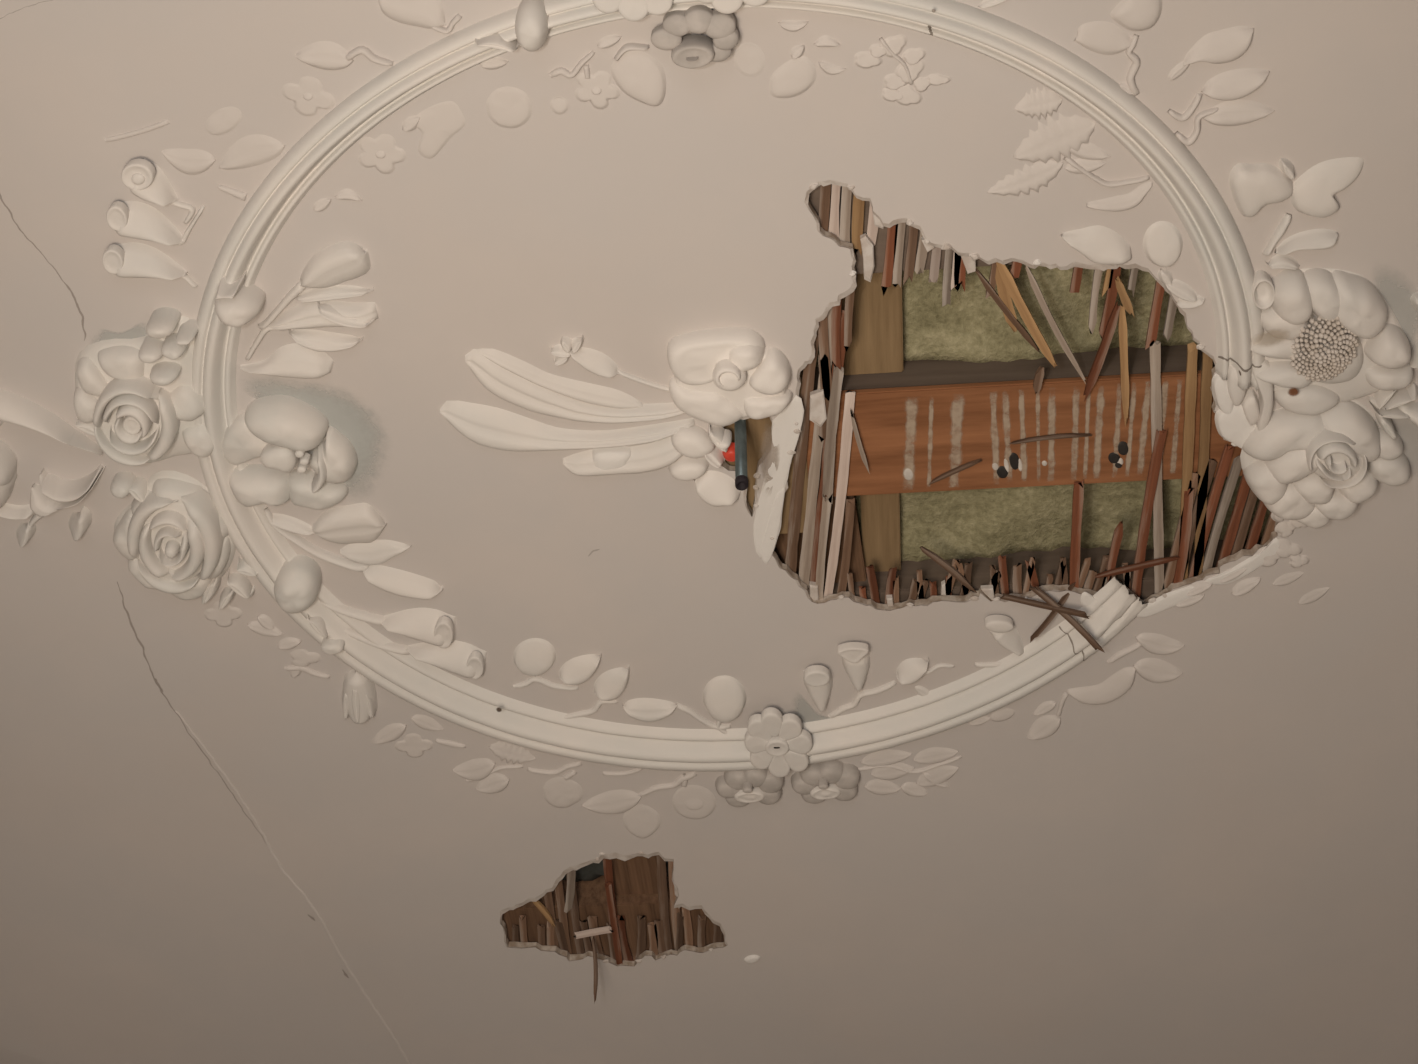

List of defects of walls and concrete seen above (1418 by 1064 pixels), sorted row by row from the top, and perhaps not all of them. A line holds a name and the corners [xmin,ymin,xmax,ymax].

crack [0,194,86,341]
spalling [743,180,1280,617]
crack [117,582,410,1064]
spalling [500,852,728,966]